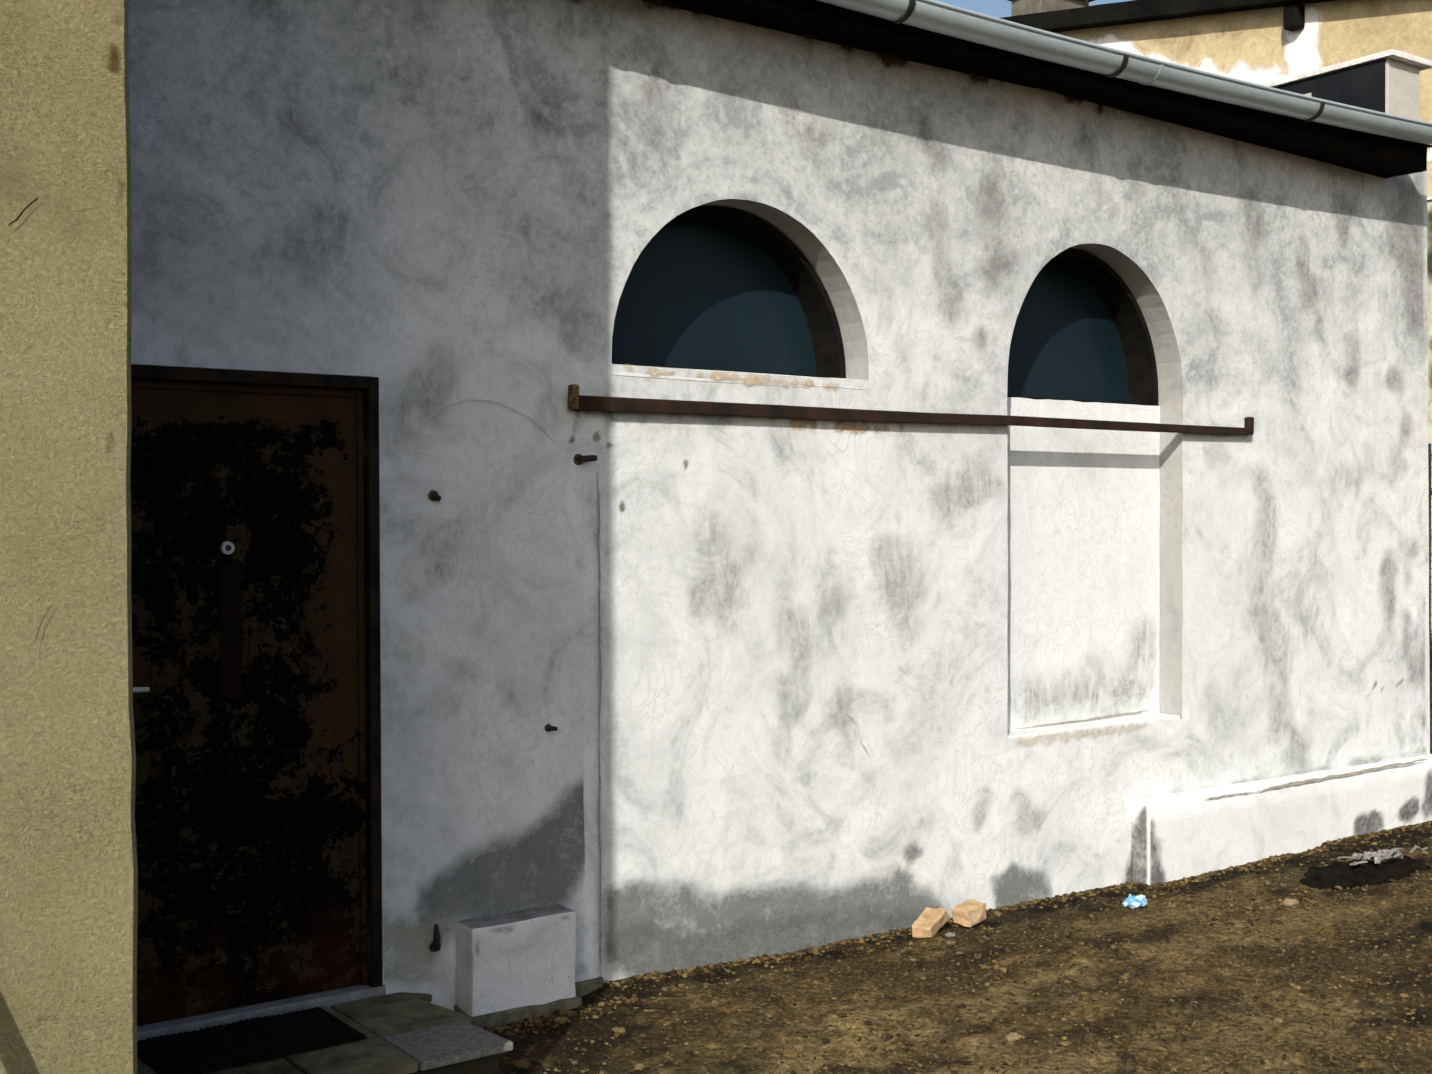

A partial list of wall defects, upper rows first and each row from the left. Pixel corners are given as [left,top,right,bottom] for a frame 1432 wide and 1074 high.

flaking render [644,0,714,15]
flaking render [798,32,912,68]
flaking render [1087,7,1322,84]
rust [791,419,816,428]
rust [836,422,887,433]
damp [1400,774,1432,820]
damp [1126,807,1165,885]
damp [1355,811,1383,836]
damp [382,786,585,981]
damp [607,847,941,974]